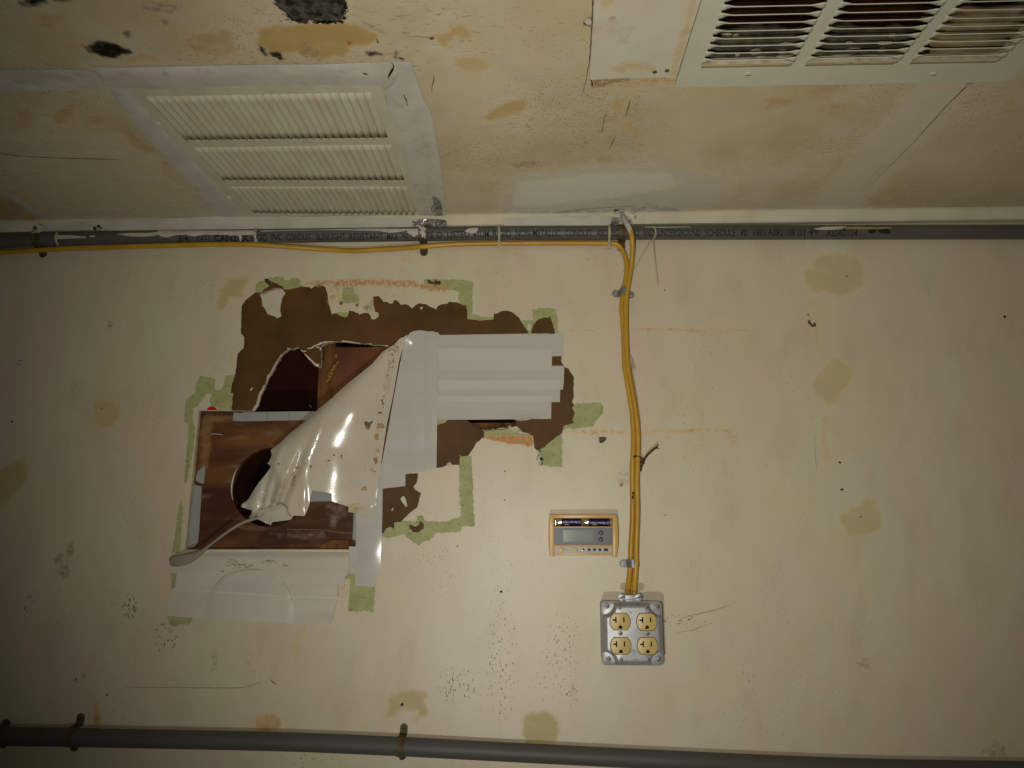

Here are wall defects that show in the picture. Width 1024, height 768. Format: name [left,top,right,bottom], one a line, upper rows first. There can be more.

damp [87,41,132,58]
damp [256,23,379,60]
damp [485,100,525,120]
damp [806,256,863,296]
peeling [183,277,559,484]
peeling [382,356,606,546]
damp [840,500,880,536]
peeling [345,574,376,612]
damp [388,690,428,717]
damp [523,711,559,744]